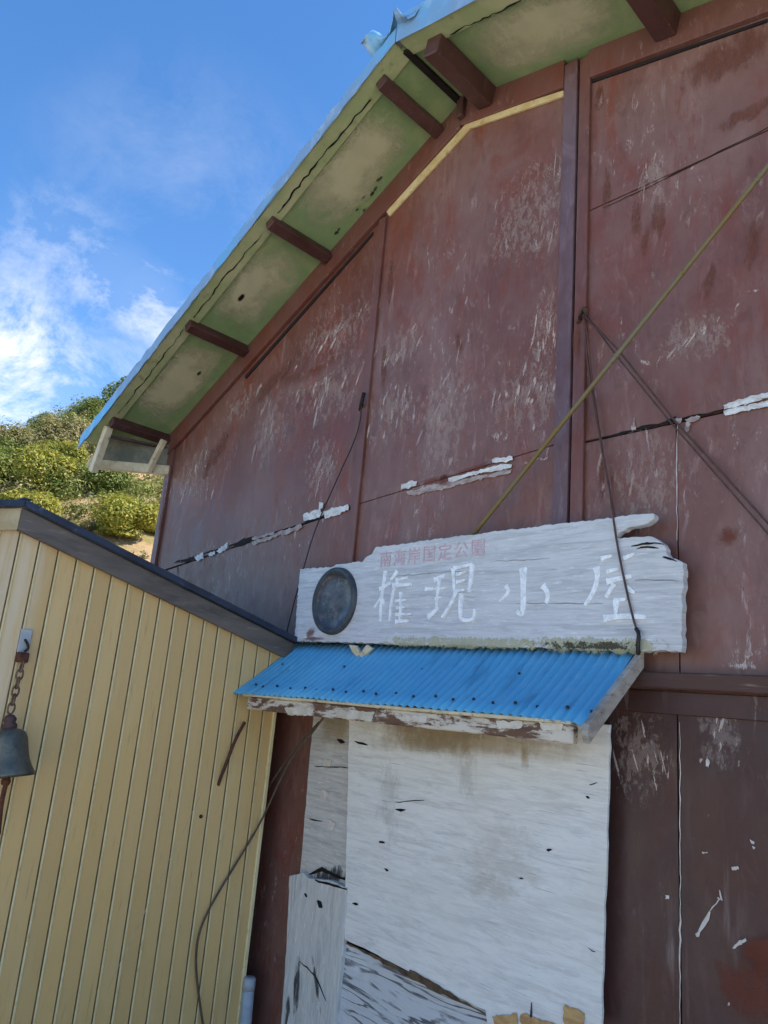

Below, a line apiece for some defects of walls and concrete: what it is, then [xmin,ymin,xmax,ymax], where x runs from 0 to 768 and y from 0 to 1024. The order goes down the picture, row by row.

peeling [723,392,768,415]
peeling [401,456,513,496]
peeling [251,502,349,545]
peeling [195,542,228,561]
peeling [285,707,315,716]
peeling [334,709,375,721]
peeling [406,714,428,723]
peeling [496,720,523,729]